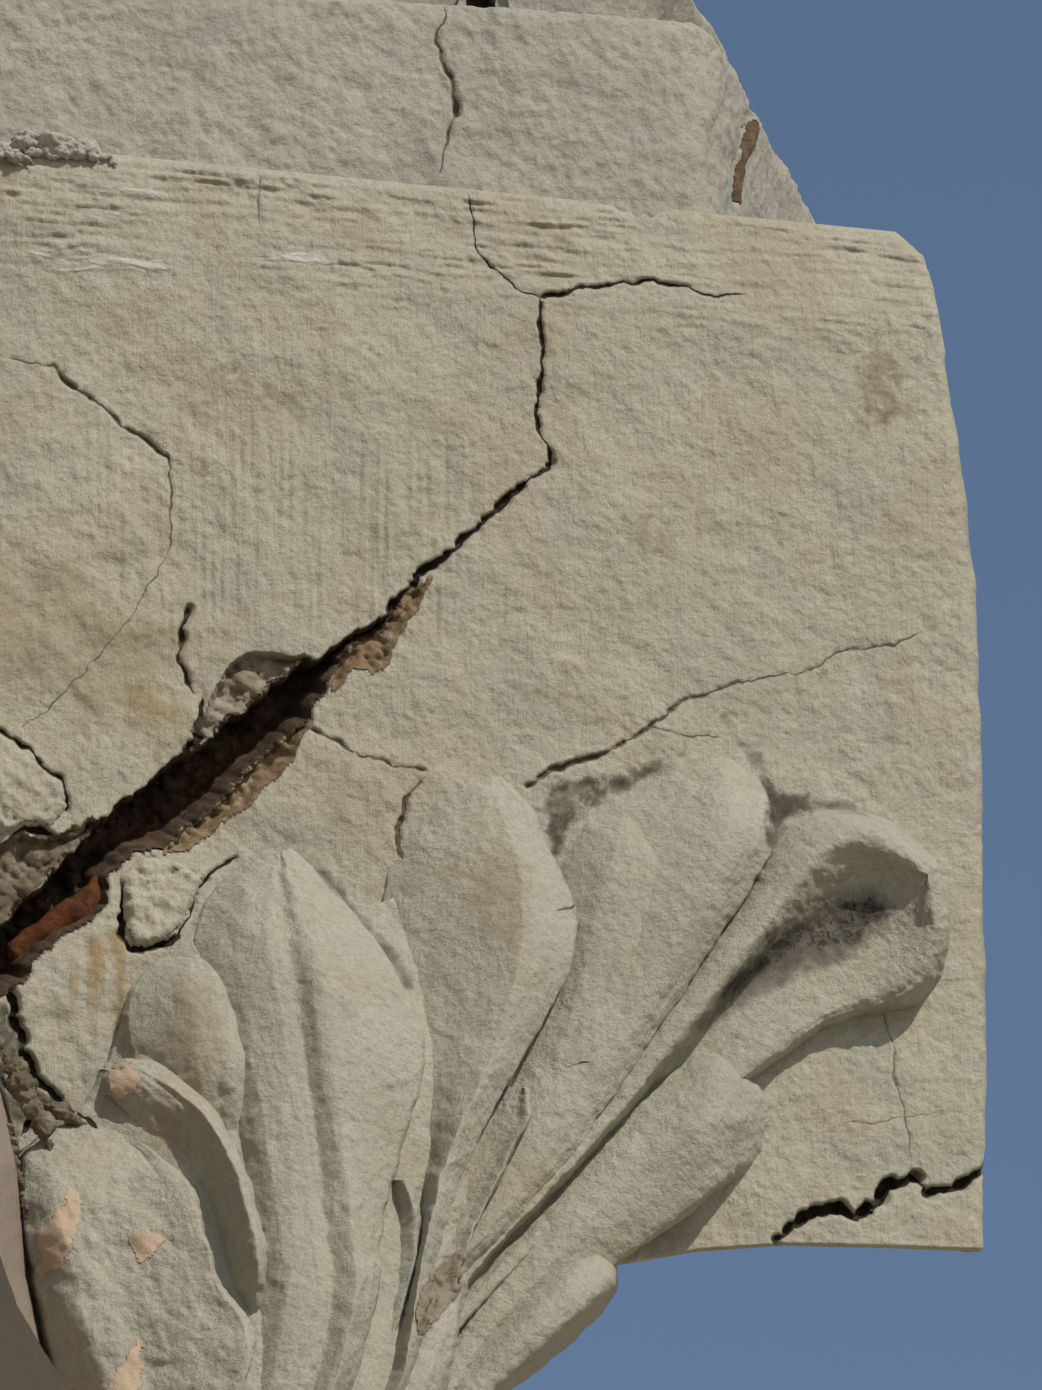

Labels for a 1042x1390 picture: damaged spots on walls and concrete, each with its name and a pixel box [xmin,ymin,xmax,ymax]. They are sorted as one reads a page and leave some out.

crack [388,198,745,610]
crack [0,357,173,842]
crack [176,607,204,751]
crack [527,633,917,786]
corrosion [6,874,102,961]
corrosion [125,830,148,841]
crack [116,857,236,952]
spalling [0,575,433,996]
leakage [547,761,660,854]
leakage [701,894,889,1028]
leakage [764,779,839,844]
crack [774,1015,984,1240]